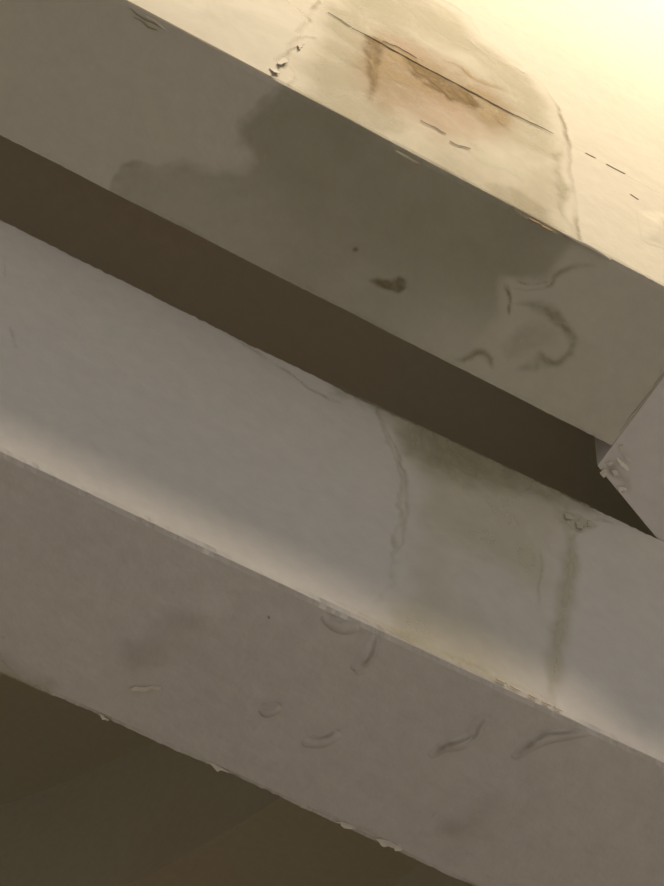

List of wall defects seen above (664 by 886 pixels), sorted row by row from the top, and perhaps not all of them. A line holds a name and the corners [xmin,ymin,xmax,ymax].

damp [362,0,539,123]